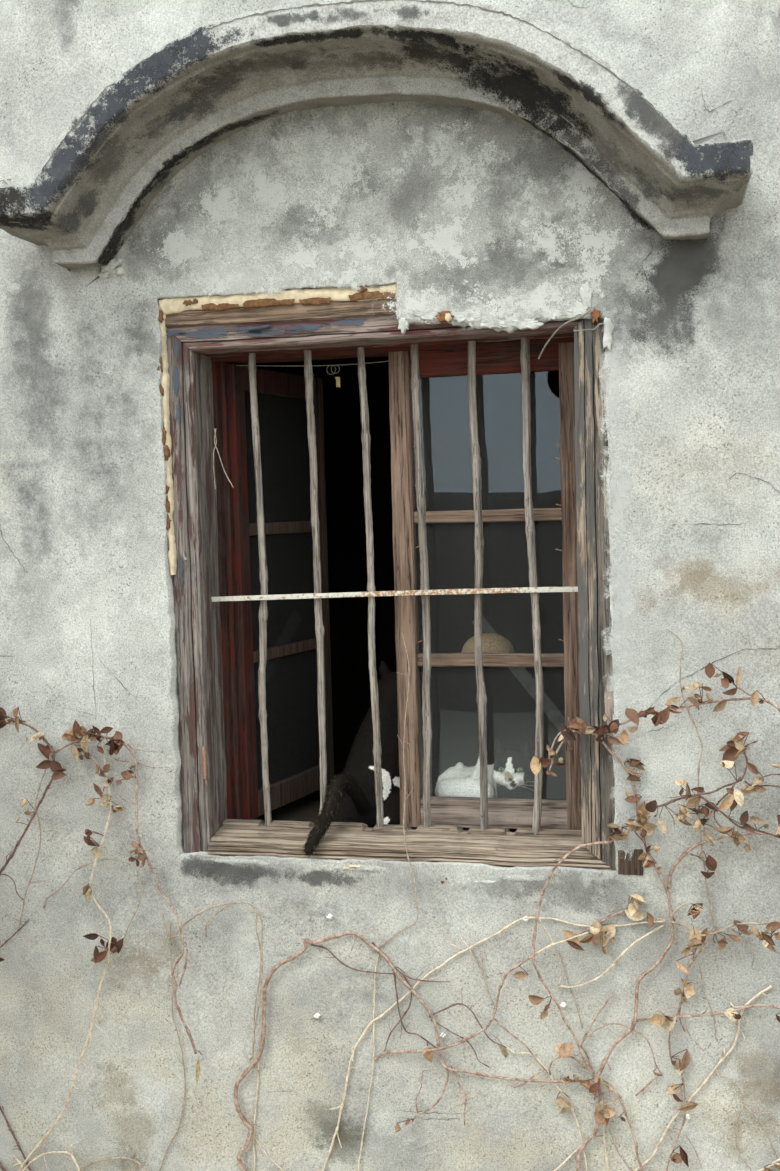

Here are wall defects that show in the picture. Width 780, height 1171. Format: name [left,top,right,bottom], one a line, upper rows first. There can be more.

water stain [0,0,754,355]
peeling [150,107,644,585]